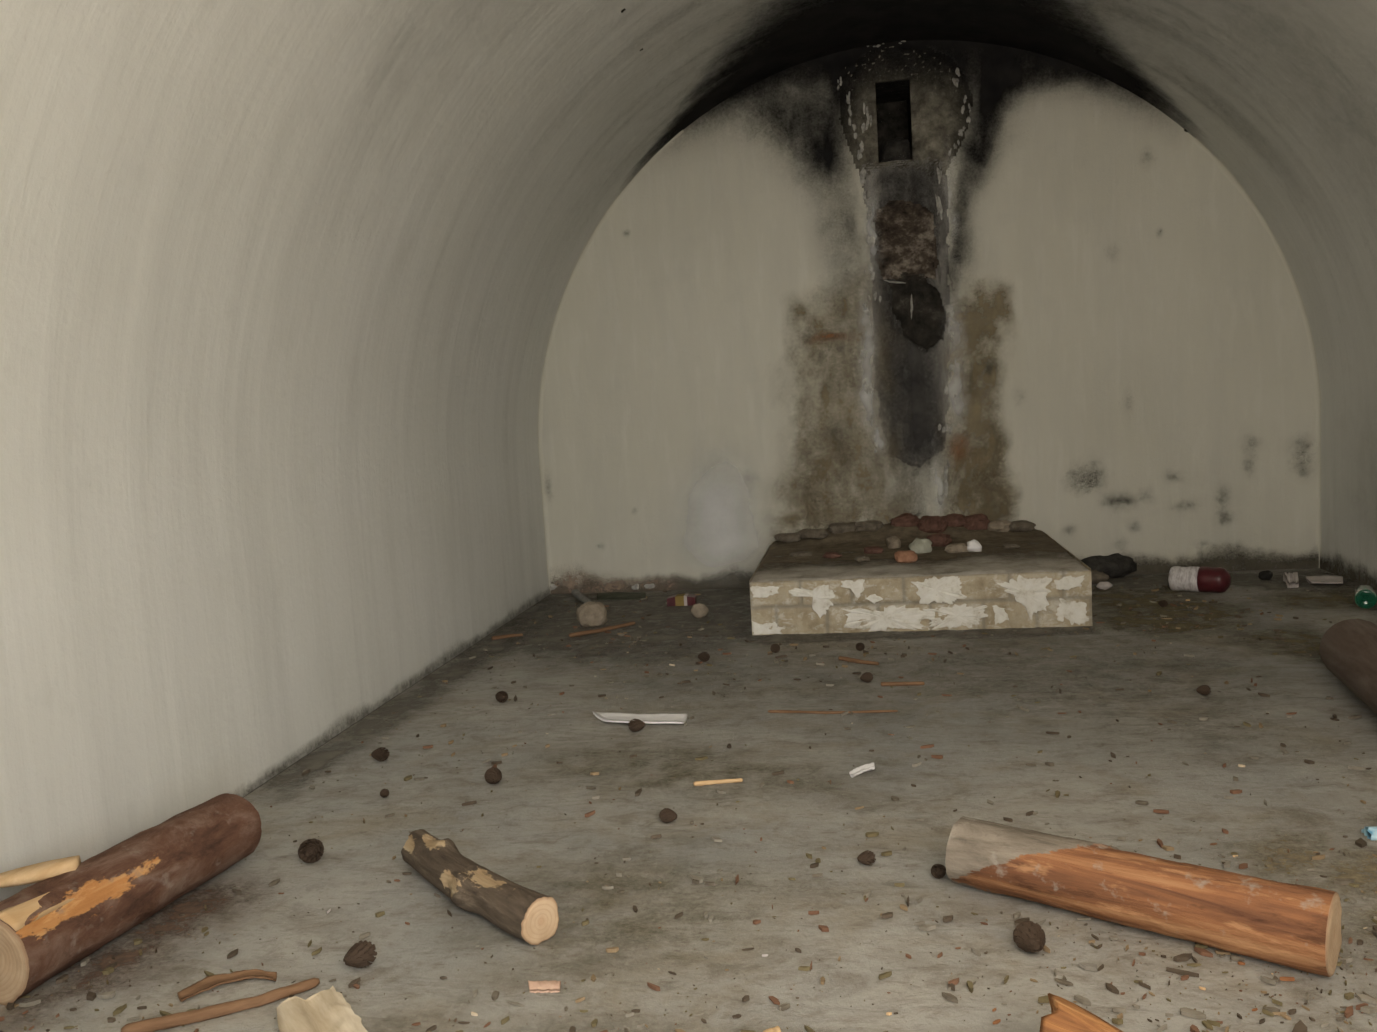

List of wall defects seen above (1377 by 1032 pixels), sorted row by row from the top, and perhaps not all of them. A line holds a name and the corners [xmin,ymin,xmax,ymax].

flaking render [837,41,971,505]
water stain [784,297,917,528]
water stain [947,289,1011,521]
peeling [752,621,785,635]
peeling [750,575,1089,631]